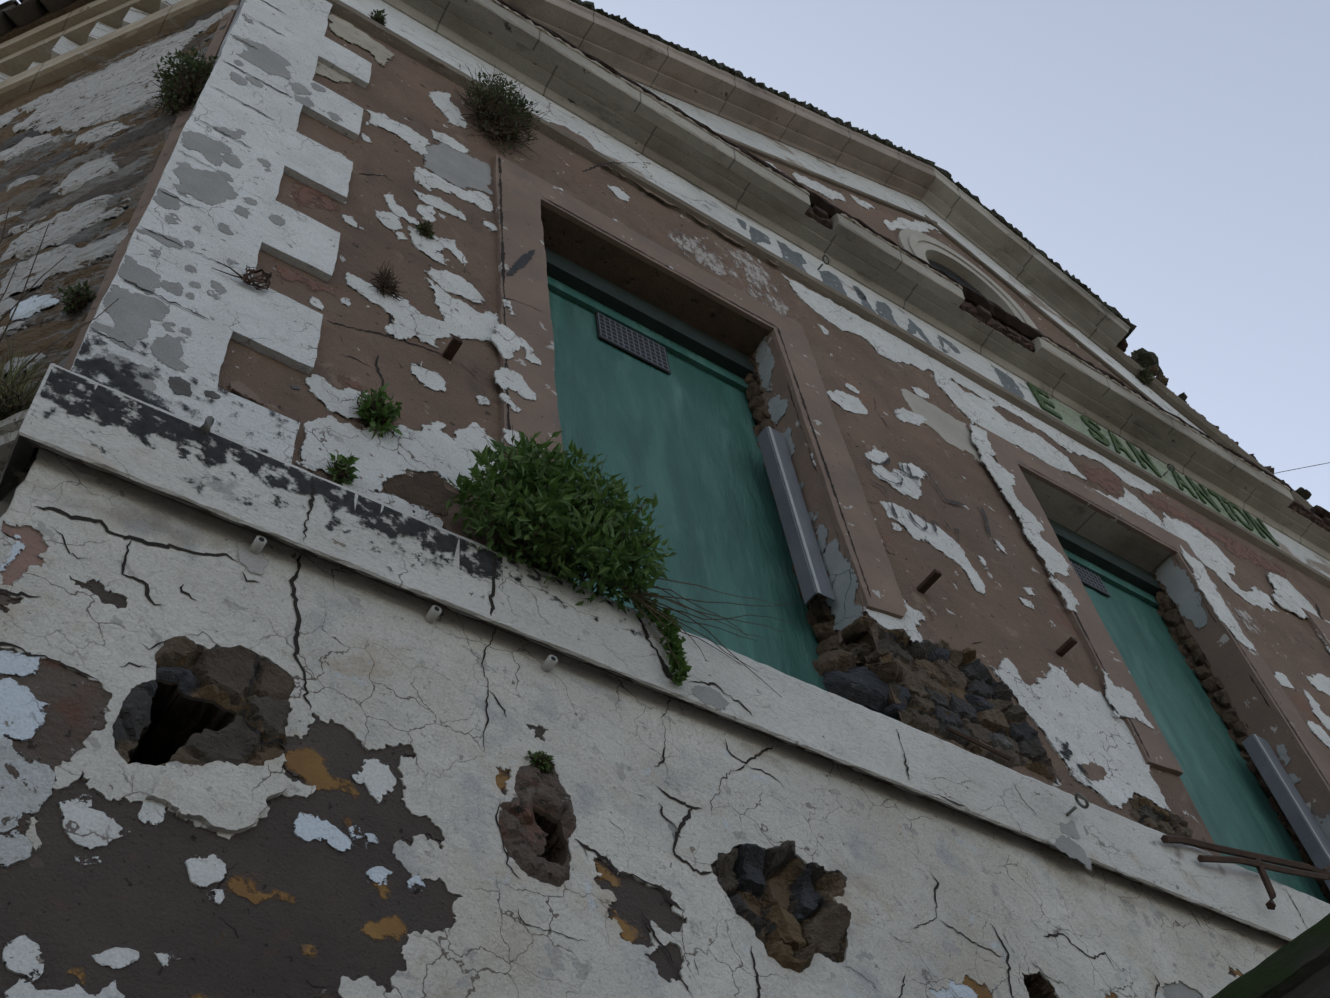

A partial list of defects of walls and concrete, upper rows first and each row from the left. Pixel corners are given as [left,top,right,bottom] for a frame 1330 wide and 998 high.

peeling [340,91,541,413]
crack [0,482,316,709]
flaking render [0,636,461,998]
leakage [28,328,570,608]
peeling [290,374,526,528]
crack [495,799,588,941]
crack [574,819,699,997]
crack [636,616,783,875]
crack [751,946,761,998]
spalling [711,840,851,973]
spalling [808,511,1193,838]
peeling [767,259,1330,653]